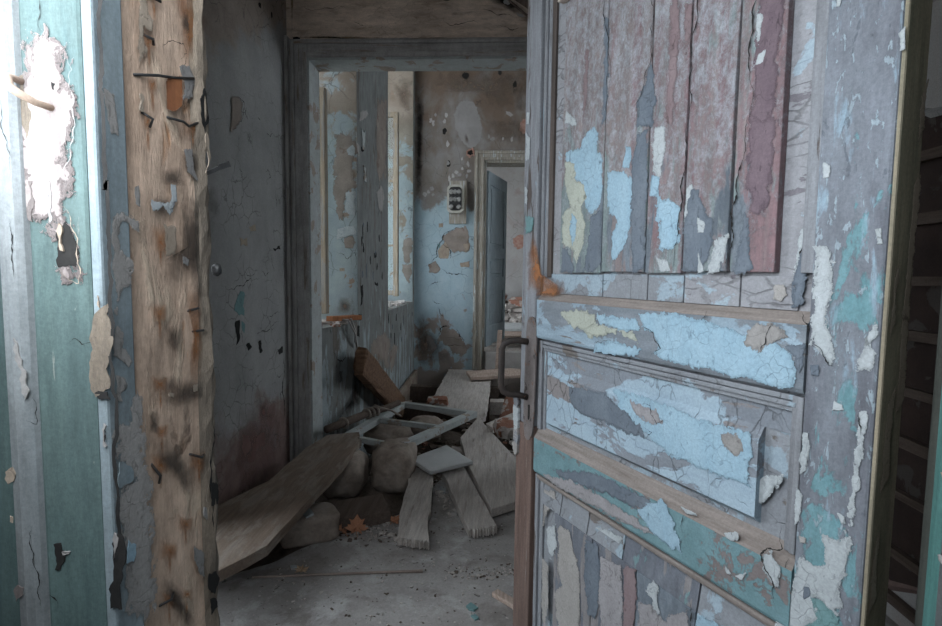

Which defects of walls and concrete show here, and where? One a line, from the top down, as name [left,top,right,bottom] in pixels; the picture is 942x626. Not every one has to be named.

peeling [19,1,87,285]
crack [70,0,127,610]
spalling [333,97,387,336]
peeling [561,16,632,276]
peeling [636,0,730,274]
peeling [560,229,839,392]
peeling [744,0,785,215]
peeling [898,26,906,51]
peeling [541,467,723,626]
peeling [569,387,784,504]
peeling [762,550,781,588]
peeling [775,410,868,626]